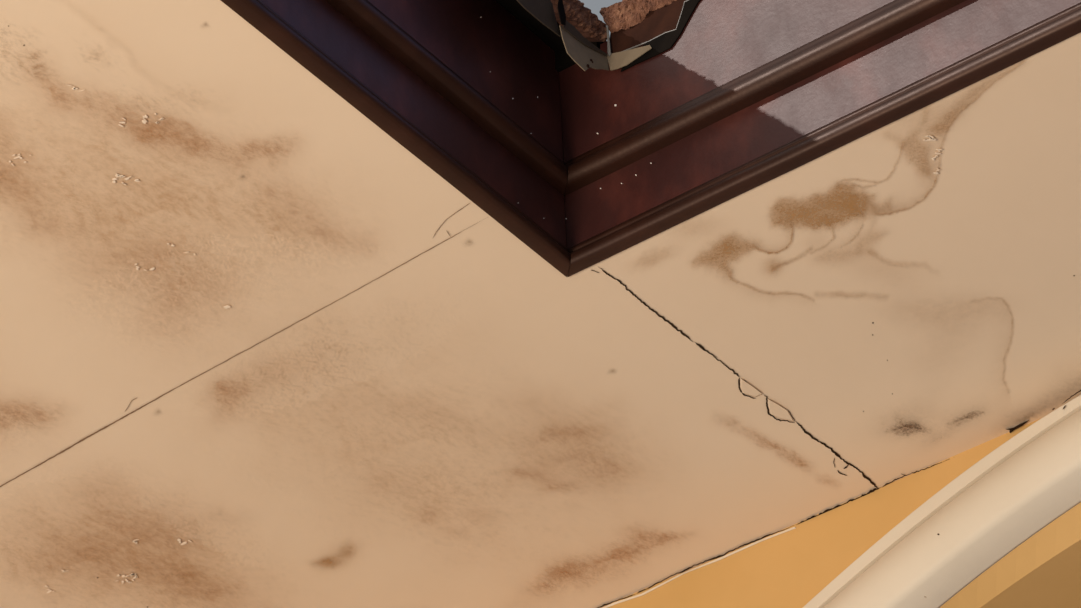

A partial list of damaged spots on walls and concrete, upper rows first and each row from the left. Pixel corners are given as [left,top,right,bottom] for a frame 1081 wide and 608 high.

water stain [765,185,868,254]
crack [591,268,949,608]